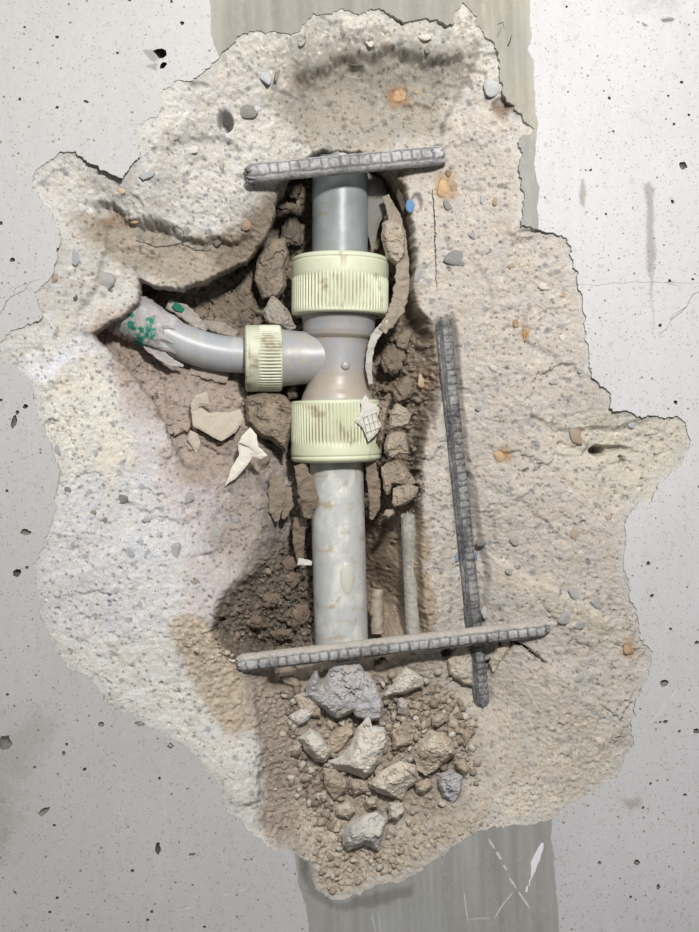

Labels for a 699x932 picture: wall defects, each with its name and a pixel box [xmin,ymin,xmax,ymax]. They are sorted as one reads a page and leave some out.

spalling [153,48,167,69]
spalling [240,104,258,119]
spalling [244,146,448,183]
spalling [368,213,396,307]
crack [580,281,698,335]
spalling [268,384,307,402]
flaking render [225,428,267,486]
spalling [436,319,482,628]
spalling [570,428,583,445]
spalling [235,391,550,672]
spalling [558,609,571,625]
spalling [468,644,489,709]